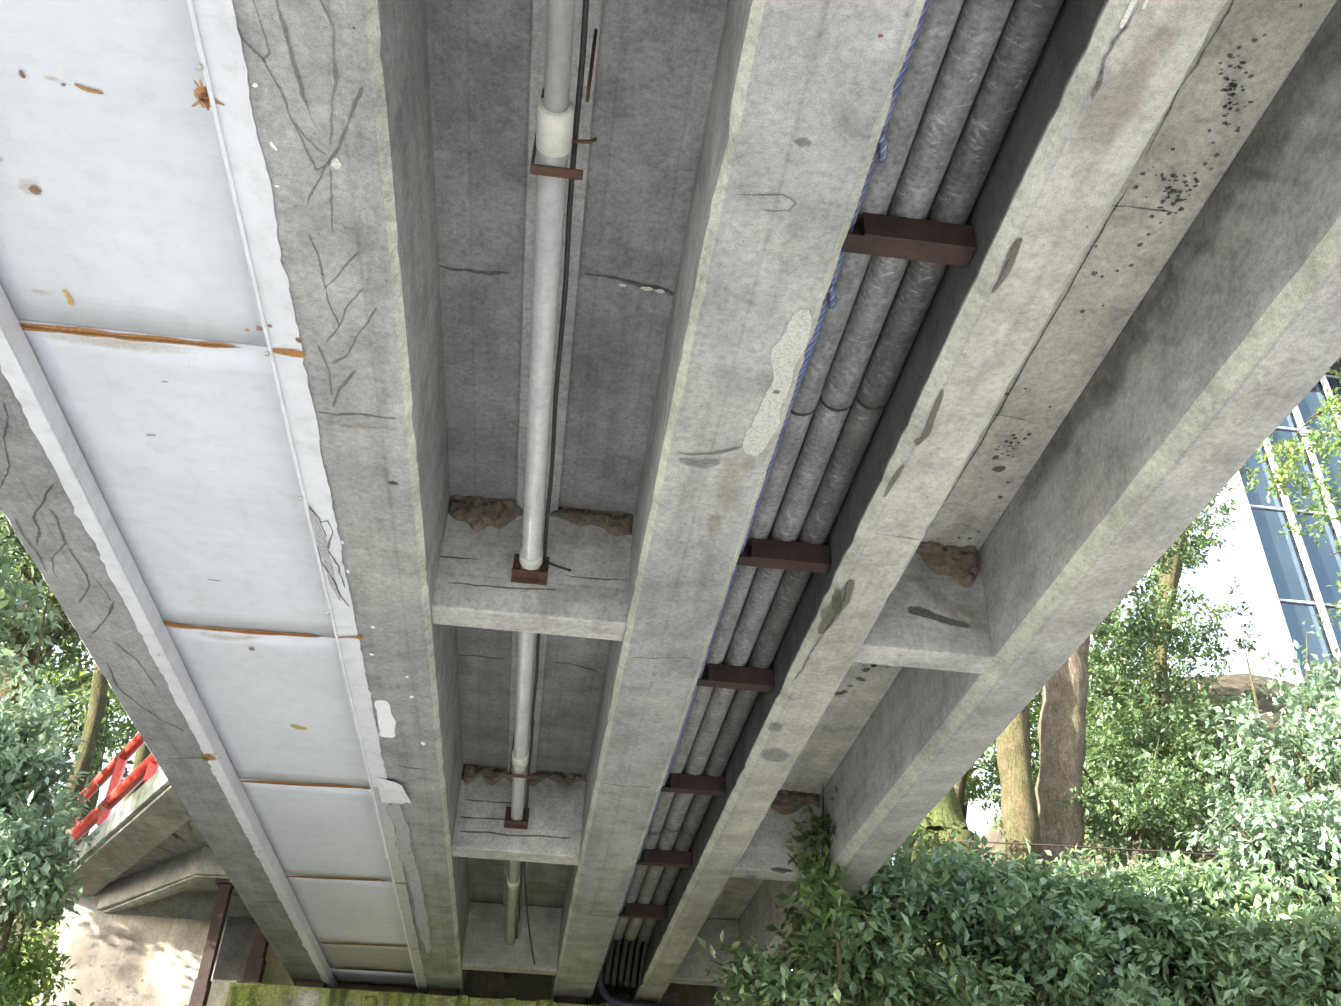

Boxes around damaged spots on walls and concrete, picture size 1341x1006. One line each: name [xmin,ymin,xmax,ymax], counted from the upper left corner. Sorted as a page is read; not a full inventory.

rust [191,80,225,111]
water stain [1133,33,1269,247]
crack [244,0,395,419]
rust [19,323,234,348]
rust [272,338,305,358]
crack [1,404,11,484]
water stain [992,429,1032,499]
spalling [448,494,523,532]
spalling [915,541,980,588]
crack [15,486,189,759]
spalling [770,790,820,815]
water stain [298,990,319,1006]